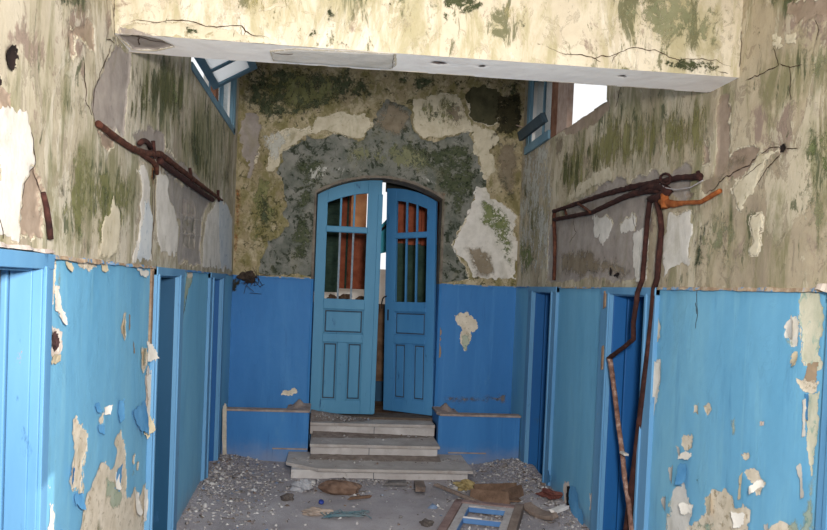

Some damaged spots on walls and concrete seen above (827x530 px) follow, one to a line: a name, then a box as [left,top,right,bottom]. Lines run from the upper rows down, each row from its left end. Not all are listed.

crack [107,0,265,43]
crack [550,23,801,97]
peeling [0,77,120,365]
rust [95,120,223,202]
spalling [238,84,518,283]
rust [552,170,722,280]
peeling [68,17,397,530]
peeling [455,312,478,351]
peeling [764,283,827,530]
peeling [48,504,63,530]
peeling [661,435,766,530]